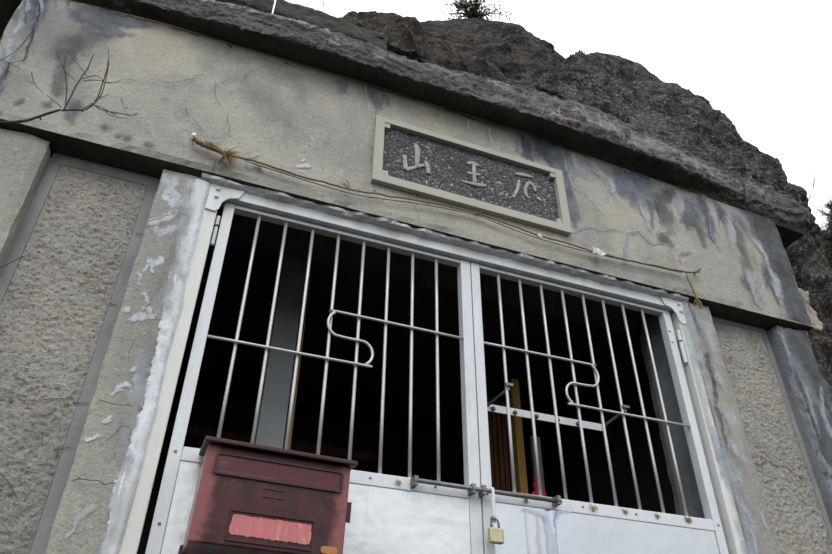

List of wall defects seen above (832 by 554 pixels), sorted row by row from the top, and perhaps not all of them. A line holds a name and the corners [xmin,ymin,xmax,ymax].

leakage [0,0,46,92]
leakage [53,0,149,96]
peeling [122,256,165,322]
leakage [505,136,832,491]
peeling [111,366,139,396]